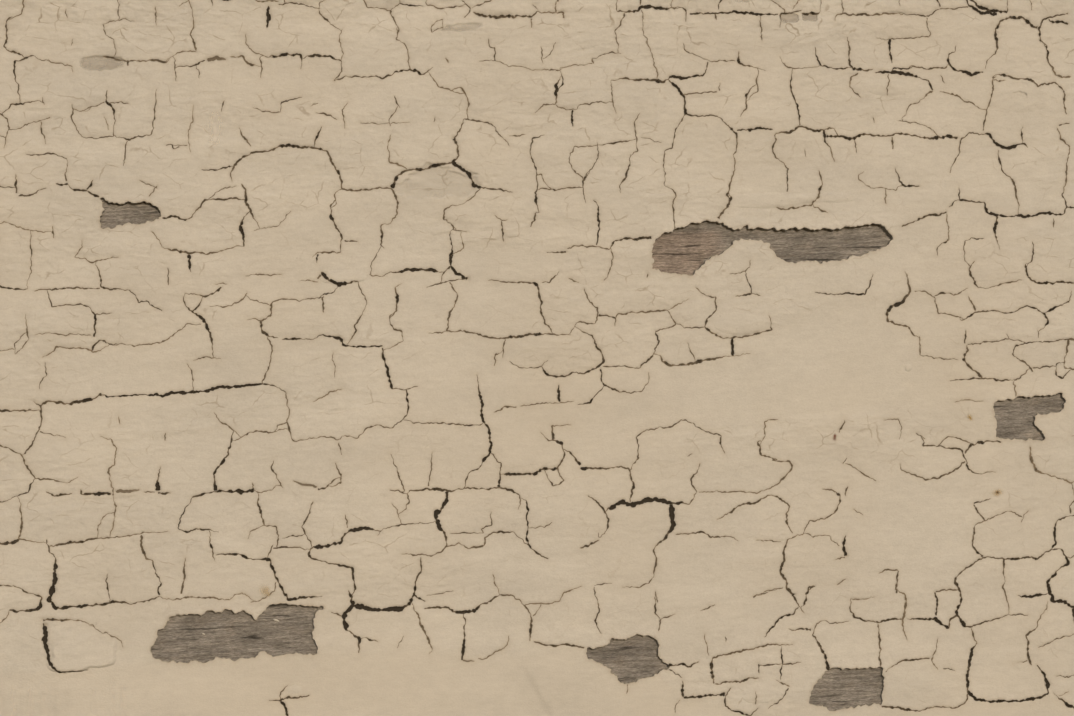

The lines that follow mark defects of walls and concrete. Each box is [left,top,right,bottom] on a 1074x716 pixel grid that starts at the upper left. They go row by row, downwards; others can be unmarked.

crack [103,0,205,80]
crack [0,0,99,197]
crack [71,89,194,166]
peeling [100,198,161,229]
peeling [652,220,893,276]
peeling [993,393,1066,441]
crack [0,221,848,716]
crack [887,419,1001,481]
crack [790,447,1074,712]
peeling [150,603,323,663]
peeling [586,634,669,684]
peeling [809,667,884,711]